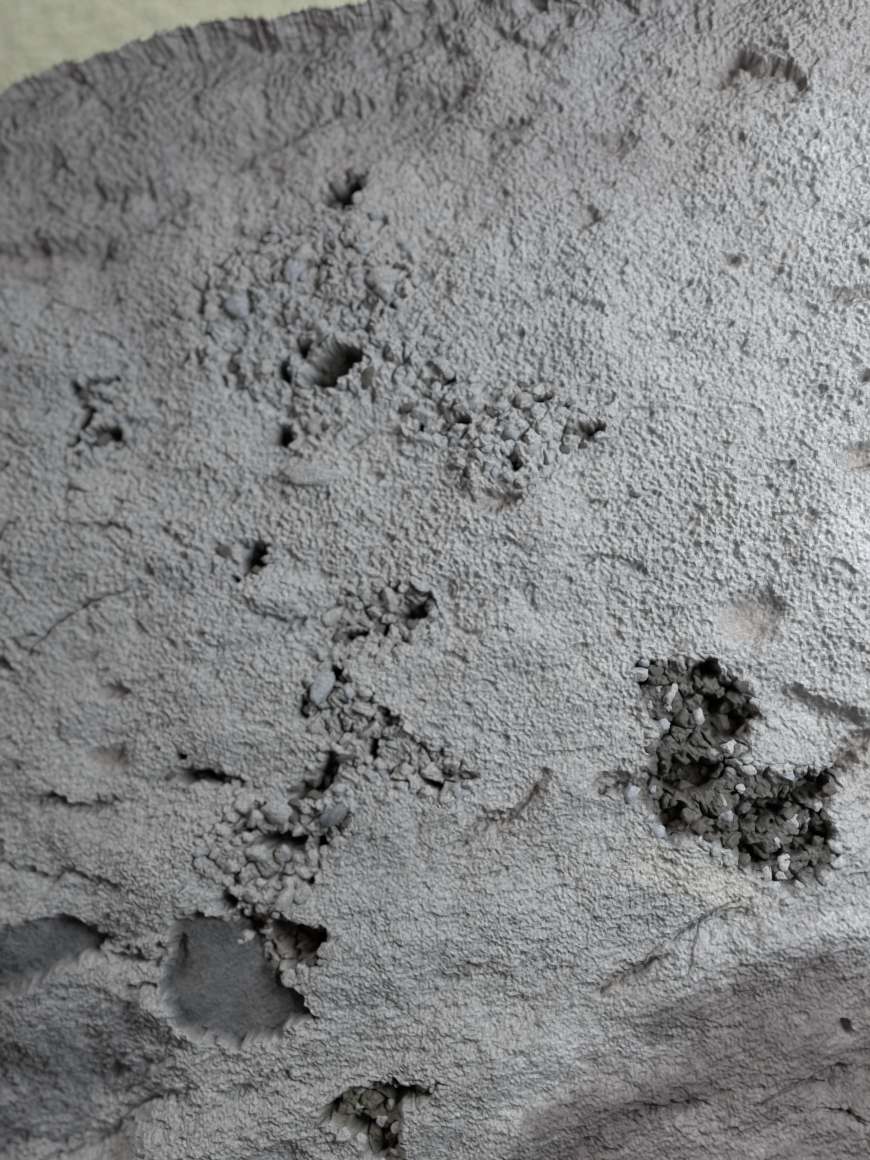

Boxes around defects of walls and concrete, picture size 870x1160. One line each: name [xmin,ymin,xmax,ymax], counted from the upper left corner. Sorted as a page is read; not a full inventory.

spalling [166,0,389,63]
spalling [0,33,162,110]
spalling [708,52,807,103]
spalling [272,337,365,397]
spalling [262,421,300,455]
spalling [566,420,608,442]
spalling [679,655,724,685]
spalling [699,691,755,743]
spalling [652,751,723,840]
spalling [733,772,839,869]
peeling [154,905,331,1057]
spalling [379,1077,413,1112]